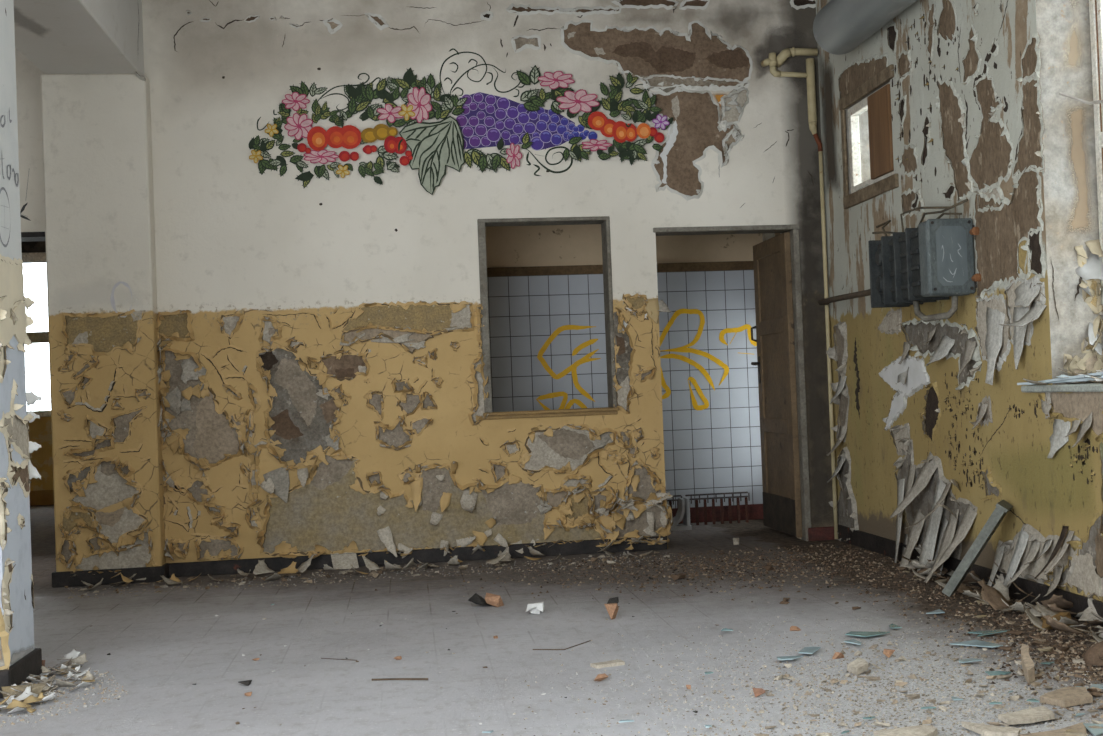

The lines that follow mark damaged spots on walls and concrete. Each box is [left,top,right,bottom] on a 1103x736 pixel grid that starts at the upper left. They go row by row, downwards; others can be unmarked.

crack [173,0,242,51]
crack [389,3,583,57]
peeling [506,0,752,201]
peeling [790,0,816,10]
peeling [838,0,1103,618]
peeling [0,254,42,670]
peeling [56,293,673,578]
peeling [826,321,859,541]